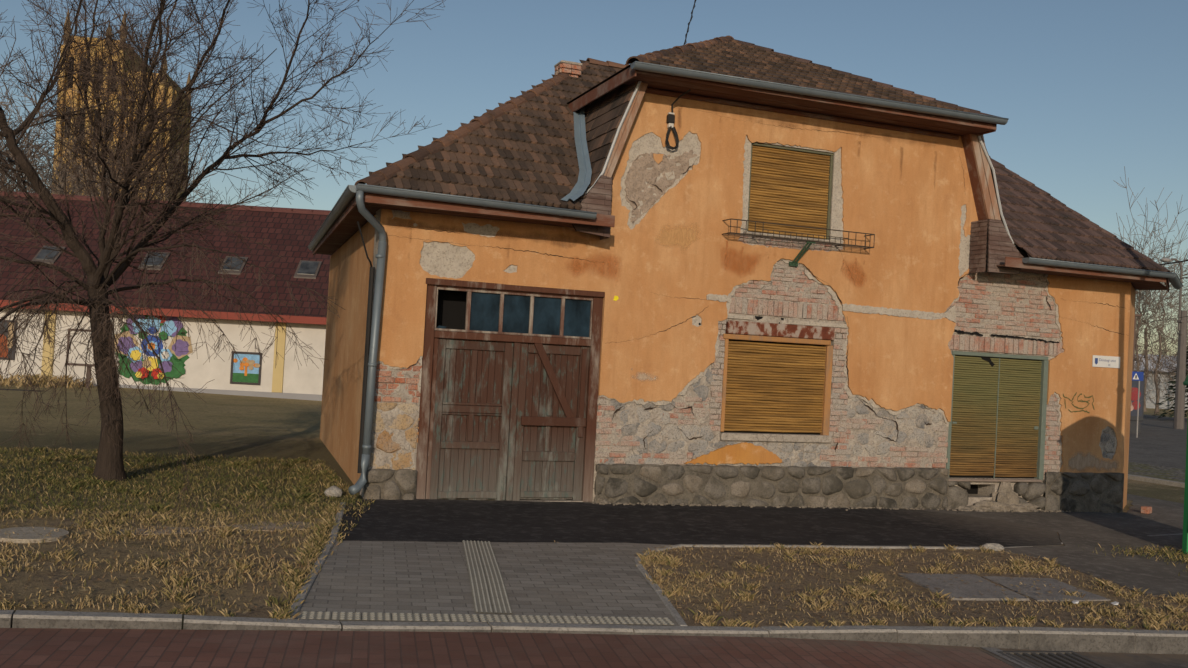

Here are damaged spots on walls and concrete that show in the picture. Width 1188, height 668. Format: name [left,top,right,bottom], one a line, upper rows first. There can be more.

peeling [419,223,499,279]
crack [605,292,707,344]
spalling [593,131,949,483]
spalling [947,204,1064,367]
spalling [368,356,422,470]
spalling [1099,426,1117,460]